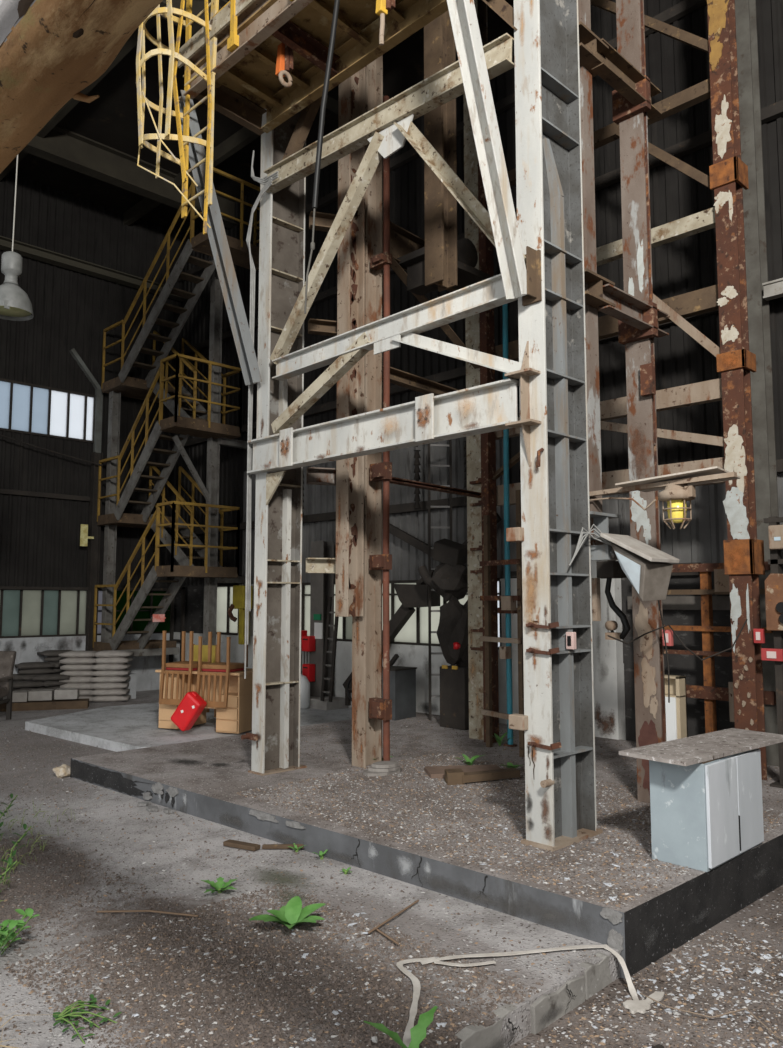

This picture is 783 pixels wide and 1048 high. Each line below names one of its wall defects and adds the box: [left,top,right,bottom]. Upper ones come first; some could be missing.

peeling [717,286,738,307]
peeling [721,325,739,345]
rust [417,407,430,427]
peeling [723,424,750,540]
rust [526,551,547,668]
rust [531,737,549,779]
rust [542,800,551,839]
peeling [2,777,590,1048]
peeling [524,898,783,1048]